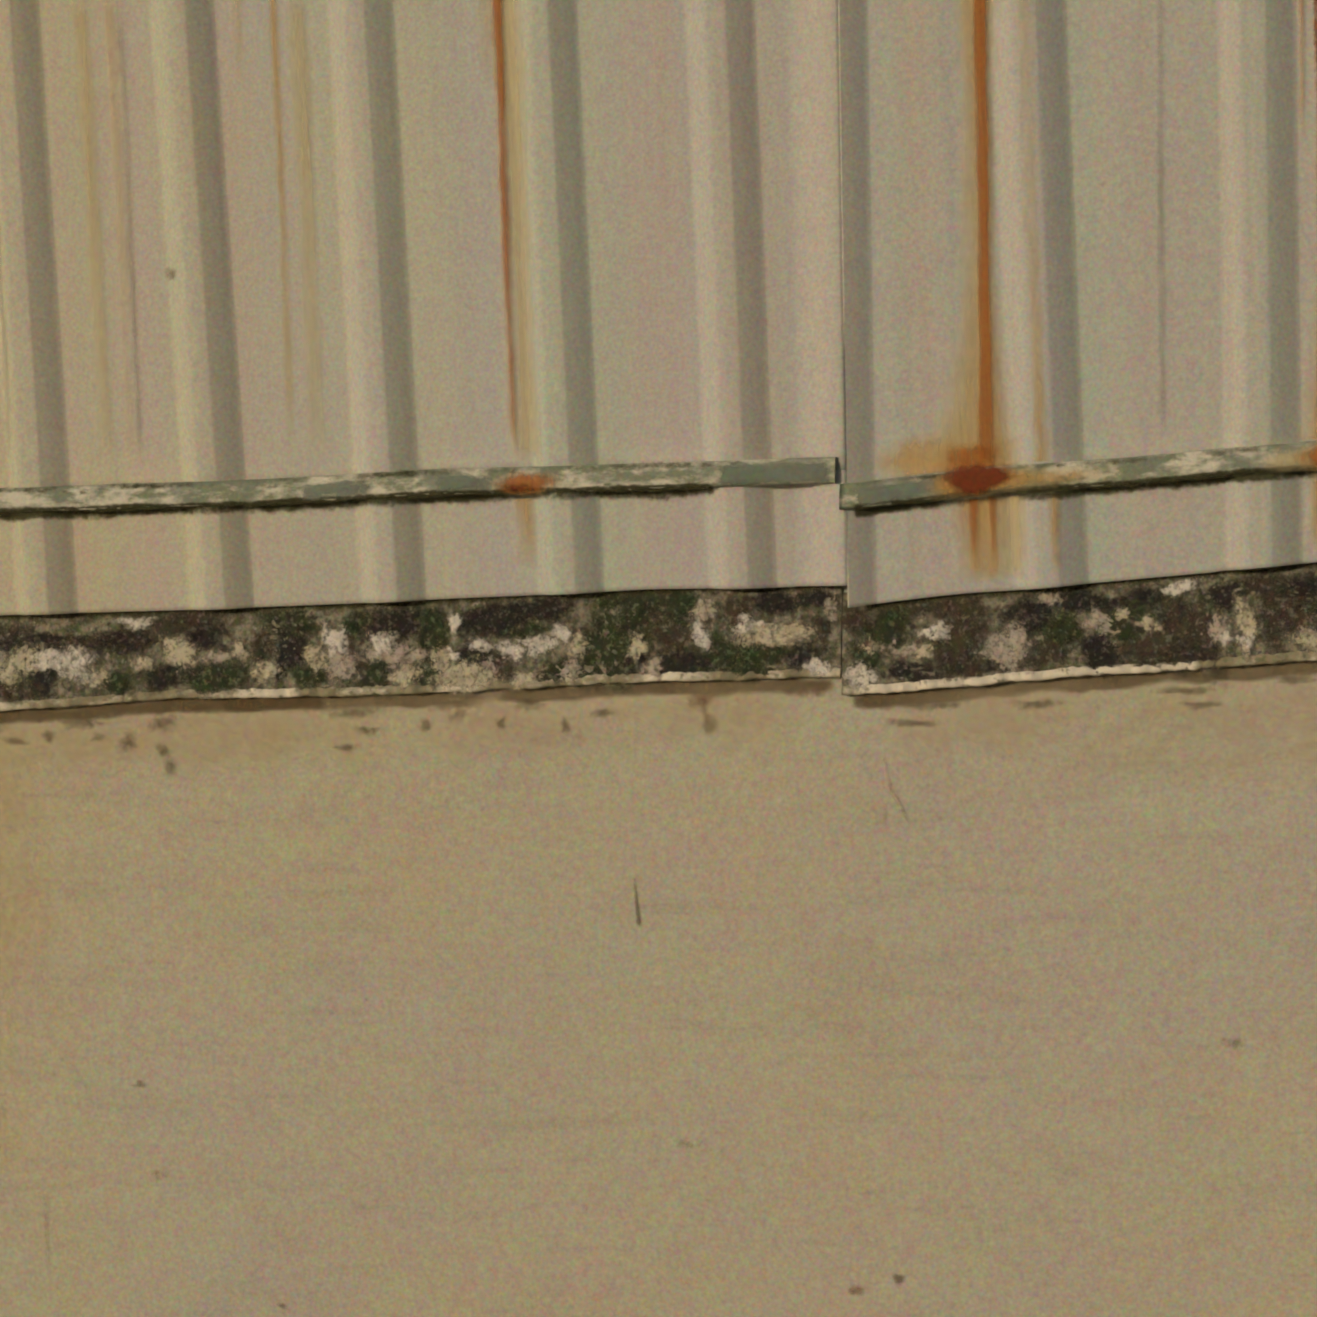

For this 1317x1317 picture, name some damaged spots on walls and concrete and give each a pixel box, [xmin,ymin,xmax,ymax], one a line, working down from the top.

corrosion [493,0,513,333]
corrosion [899,0,1052,565]
corrosion [501,474,553,493]
damp [0,568,1317,726]